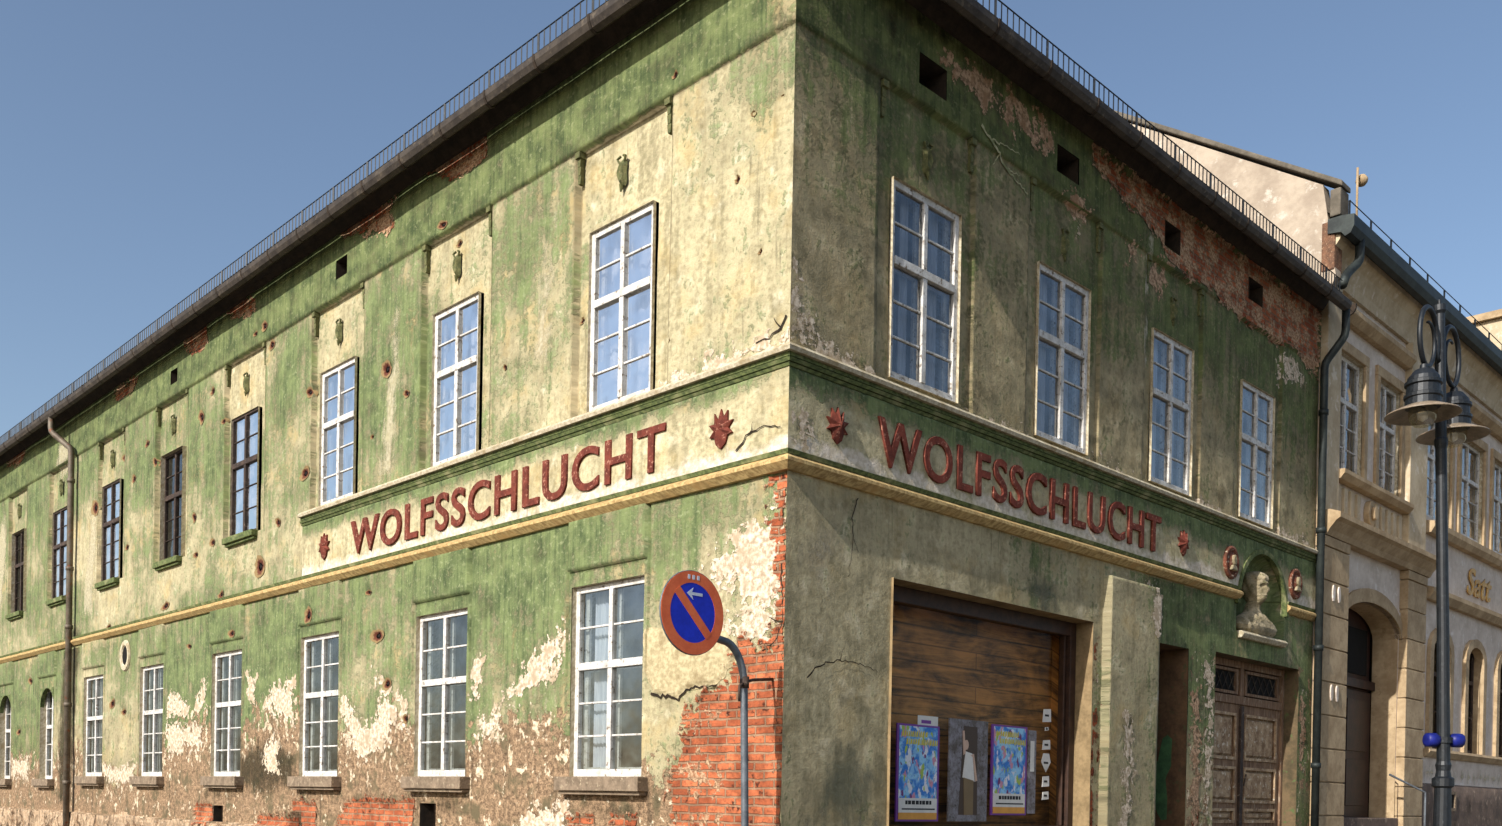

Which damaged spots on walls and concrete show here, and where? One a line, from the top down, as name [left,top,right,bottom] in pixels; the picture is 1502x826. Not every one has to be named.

peeling [937,47,1055,157]
flaking render [1092,143,1323,389]
crack [735,422,781,451]
flaking render [339,665,413,768]
flaking render [467,616,570,750]
crack [650,685,717,701]
flaking render [661,473,787,826]
crack [807,648,877,678]
peeling [1186,660,1215,826]
flaking render [251,793,318,826]
flaking render [335,792,415,826]
flaking render [512,794,641,826]